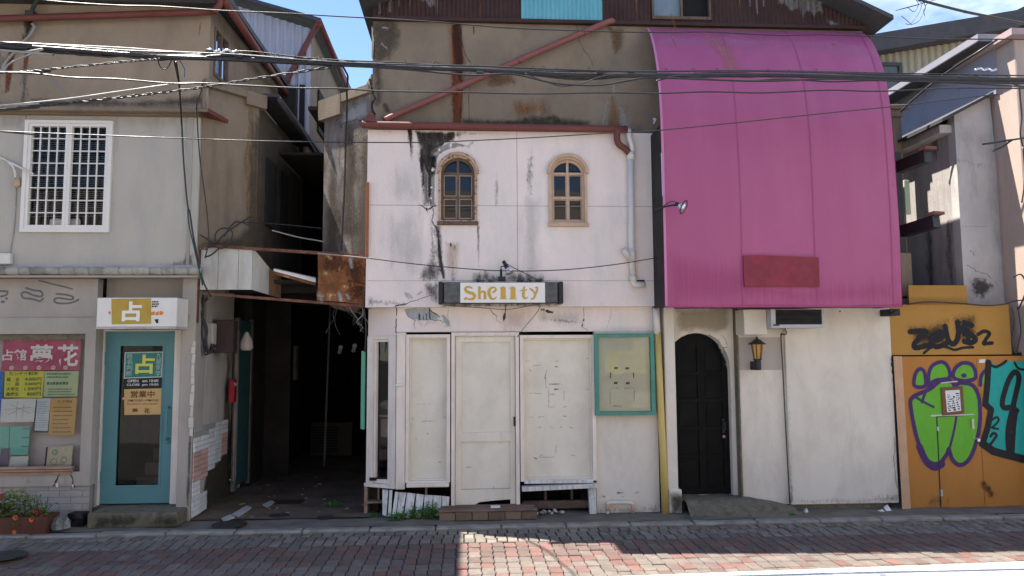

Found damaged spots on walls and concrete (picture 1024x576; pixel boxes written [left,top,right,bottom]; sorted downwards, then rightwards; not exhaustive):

corrosion [320,254,365,301]
water stain [973,278,993,296]
flaking render [405,308,450,327]